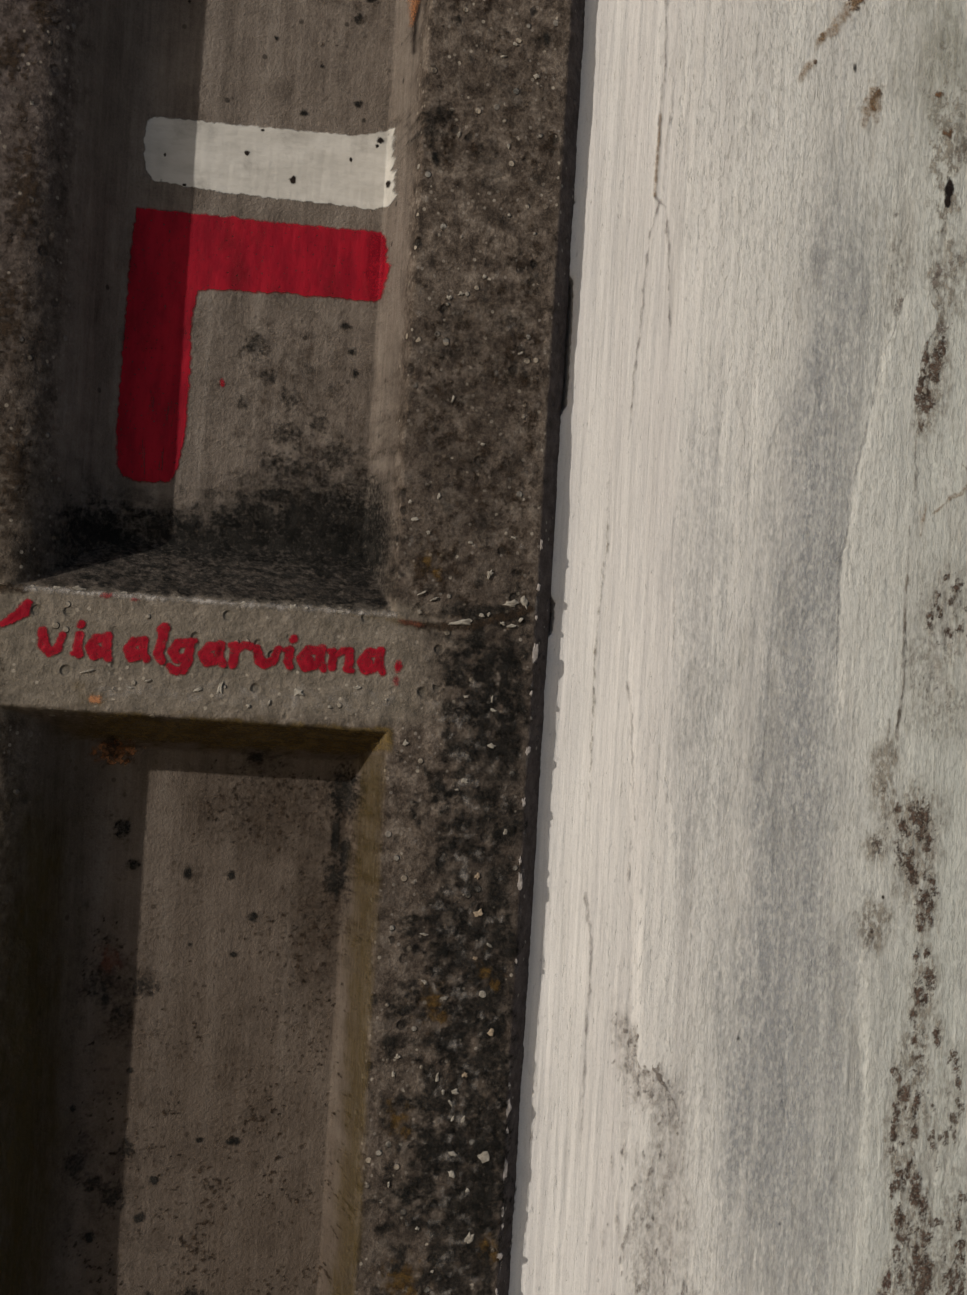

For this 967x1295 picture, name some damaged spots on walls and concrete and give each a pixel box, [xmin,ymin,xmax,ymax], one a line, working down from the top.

rust [818,0,863,41]
crack [646,116,669,258]
rust [863,88,882,120]
rust [928,77,967,232]
water stain [421,284,540,466]
water stain [43,417,537,1295]